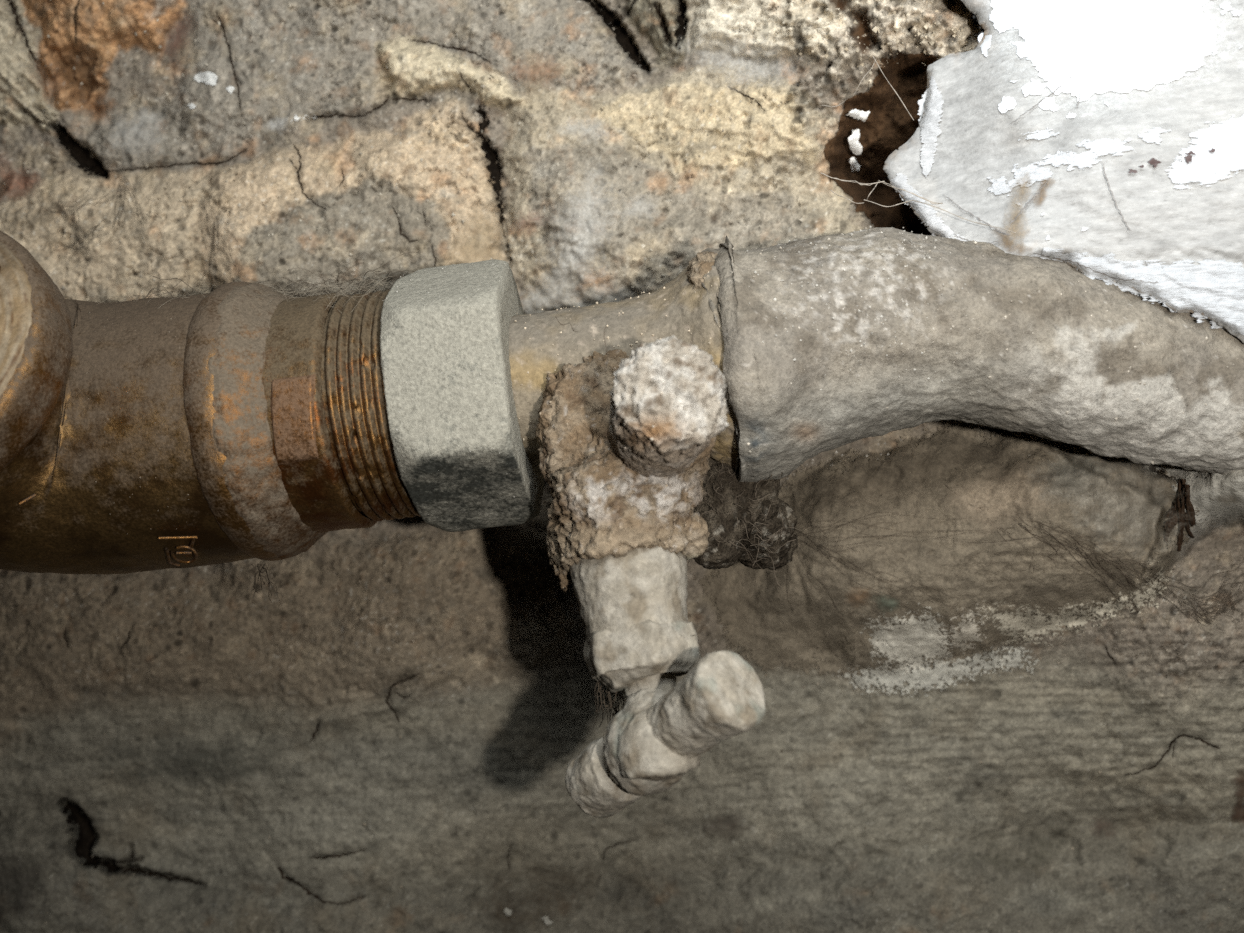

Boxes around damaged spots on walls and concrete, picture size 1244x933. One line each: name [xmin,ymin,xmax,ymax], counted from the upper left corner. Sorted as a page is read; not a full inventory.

crack [616,0,688,50]
spalling [831,0,873,54]
peeling [978,0,1242,118]
crack [408,39,513,262]
spalling [824,50,968,241]
peeling [987,128,1172,205]
peeling [1165,114,1244,190]
peeling [1030,235,1244,335]
crack [62,801,203,885]